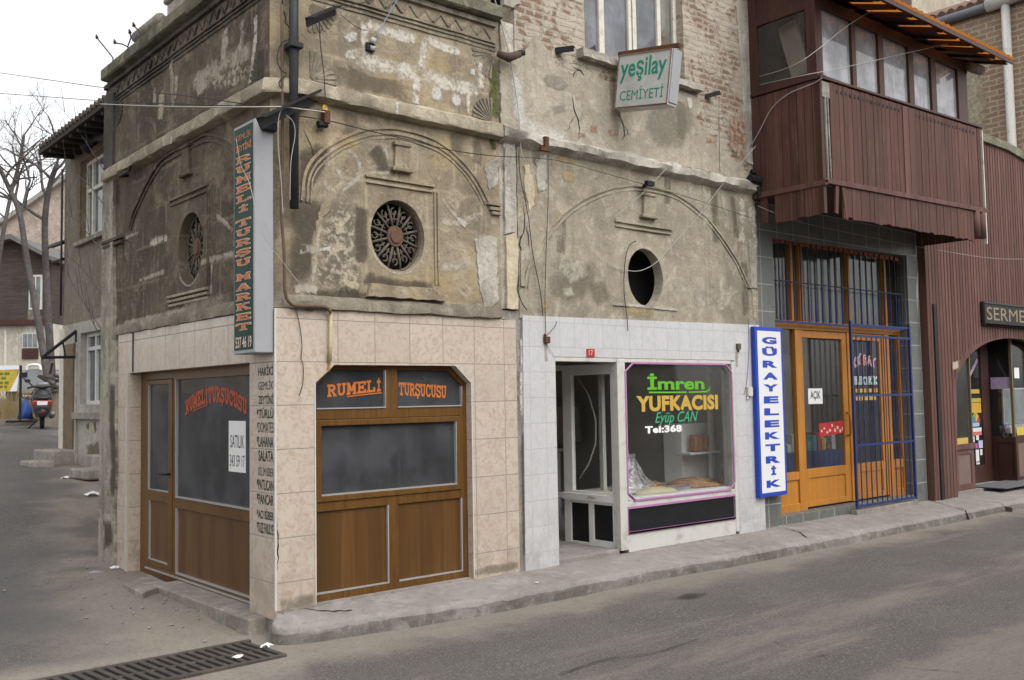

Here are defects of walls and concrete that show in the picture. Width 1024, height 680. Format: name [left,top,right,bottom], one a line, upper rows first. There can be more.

crack [569,66,584,138]
flaking render [520,156,547,258]
flaking render [474,236,499,307]